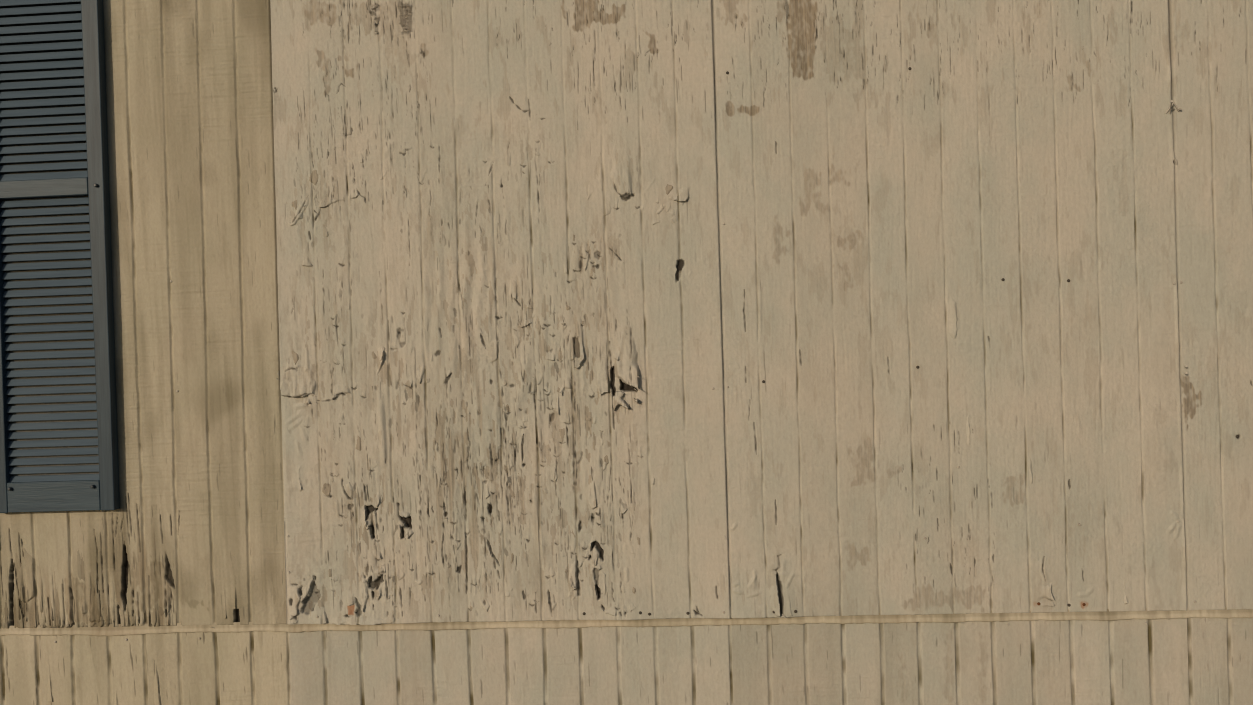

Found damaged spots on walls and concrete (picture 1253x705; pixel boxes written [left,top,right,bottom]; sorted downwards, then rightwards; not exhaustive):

peeling [558,0,629,37]
crack [496,0,788,130]
peeling [774,0,875,91]
crack [816,0,1151,117]
crack [273,0,546,266]
peeling [288,170,359,237]
peeling [561,235,621,293]
crack [0,528,23,589]
crack [61,493,180,621]
peeling [301,276,621,618]
crack [291,253,636,622]
crack [902,417,996,591]